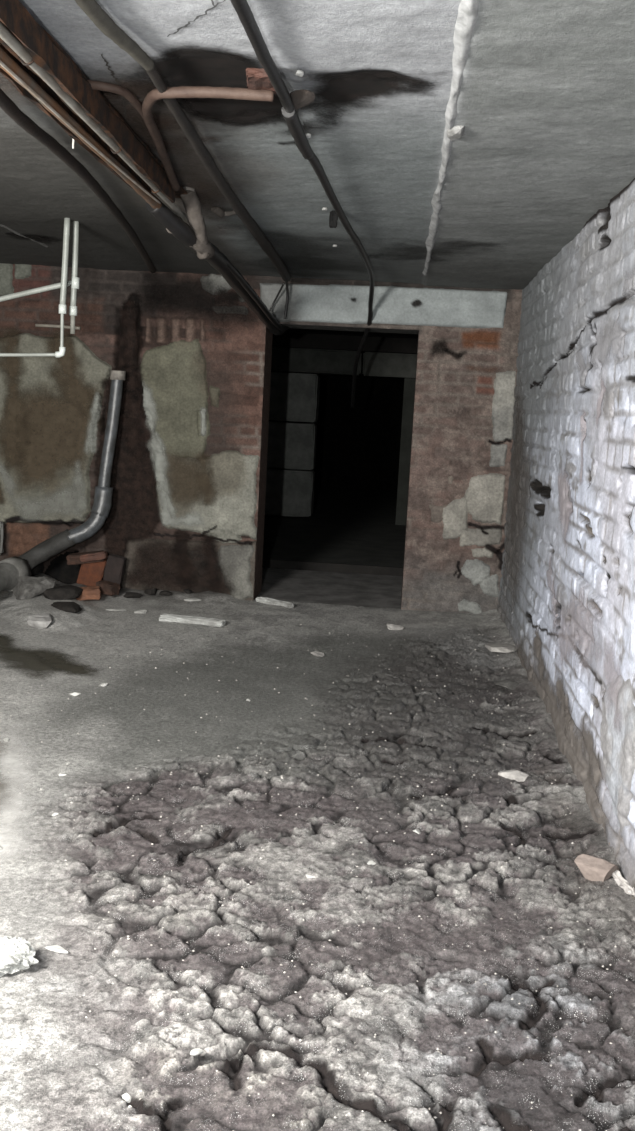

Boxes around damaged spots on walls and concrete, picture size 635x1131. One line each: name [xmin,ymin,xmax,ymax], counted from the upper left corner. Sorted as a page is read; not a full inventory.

water stain [220,110,276,125]
water stain [321,70,429,86]
crack [530,290,635,389]
water stain [0,293,232,594]
flaking render [429,371,516,614]
water stain [0,636,96,677]
water stain [0,734,29,853]
crack [93,815,235,867]
crack [471,981,554,1077]
crack [126,1098,183,1131]
crack [221,1044,408,1131]
crack [575,1078,635,1108]